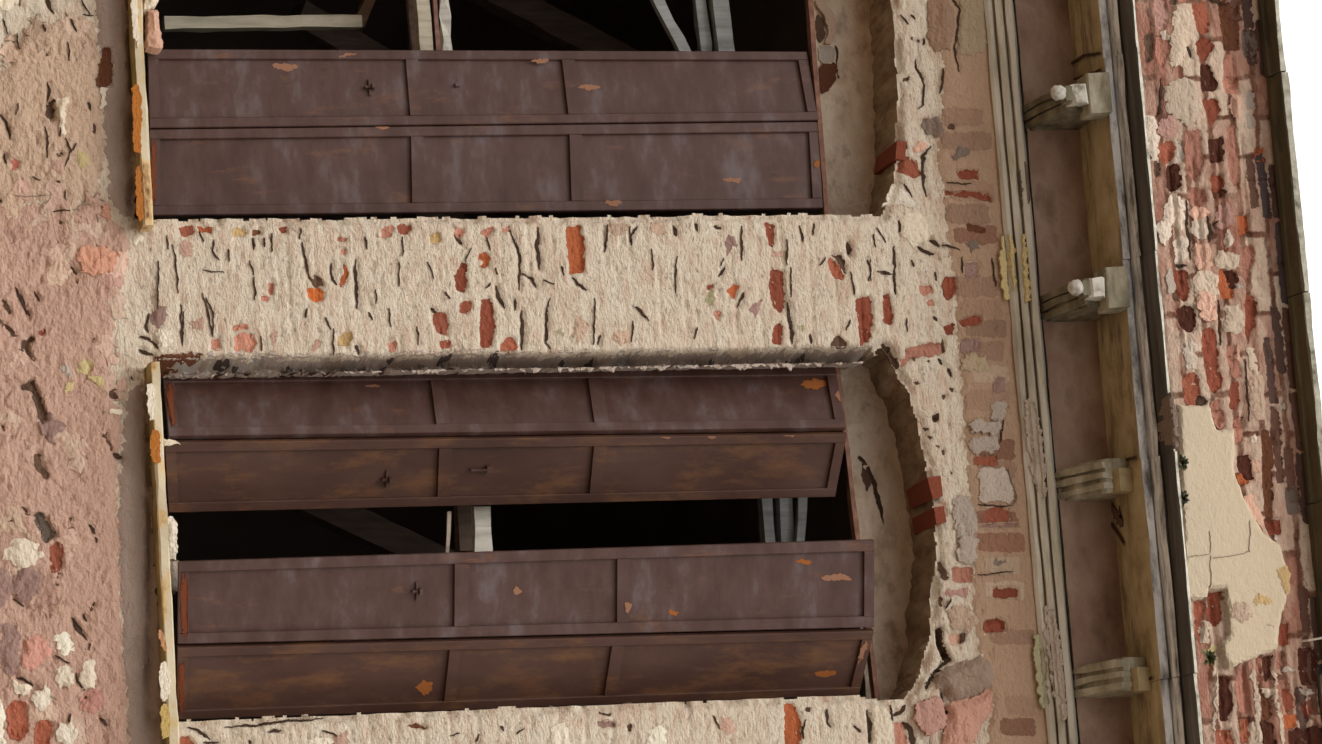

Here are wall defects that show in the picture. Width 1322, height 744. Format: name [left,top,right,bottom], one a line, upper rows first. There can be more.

flaking render [874,141,920,179]
flaking render [945,169,992,202]
flaking render [966,223,985,234]
flaking render [919,277,957,307]
flaking render [899,315,982,367]
flaking render [973,455,997,467]
flaking render [906,476,947,535]
flaking render [981,507,1017,528]
flaking render [951,566,973,583]
flaking render [992,587,1019,599]
flaking render [983,618,1005,633]
flaking render [894,722,908,744]